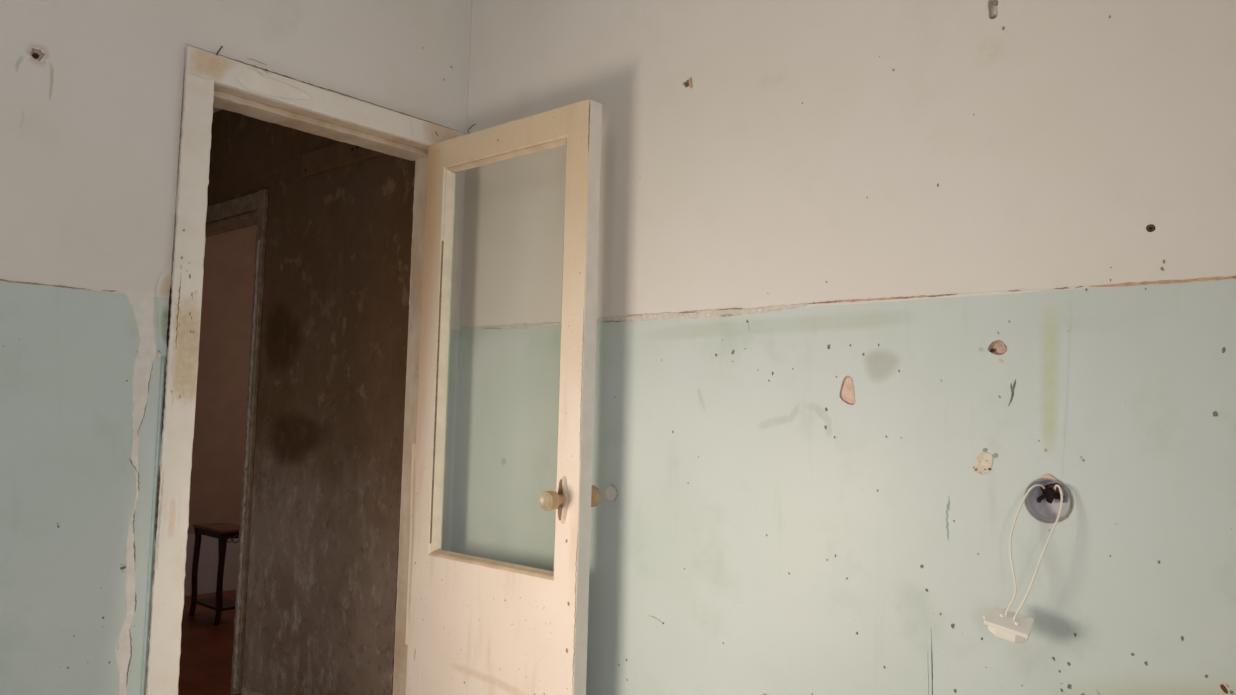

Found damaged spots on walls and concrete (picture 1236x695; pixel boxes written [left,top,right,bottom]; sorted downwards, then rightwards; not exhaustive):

spalling [972,321,1010,367]
damp [254,281,357,486]
spalling [836,376,855,405]
peeling [973,448,998,475]
peeling [0,279,161,695]